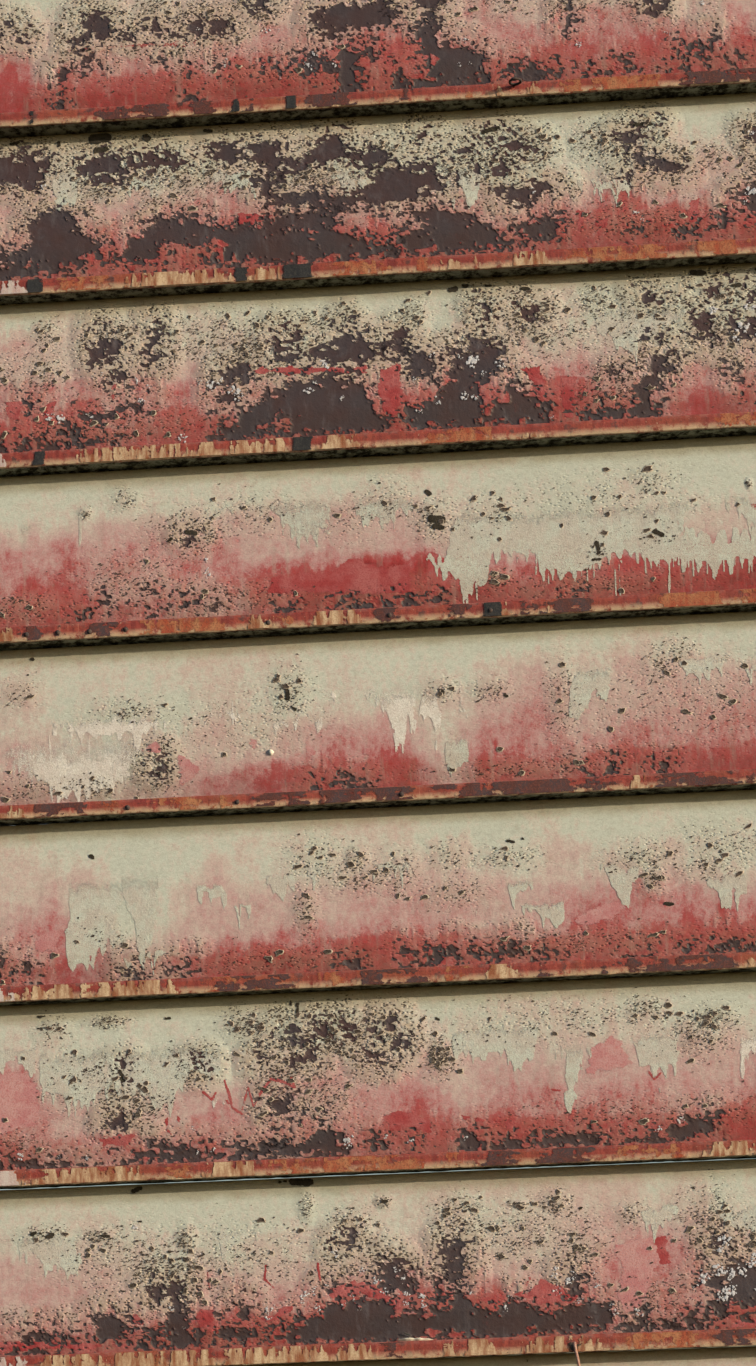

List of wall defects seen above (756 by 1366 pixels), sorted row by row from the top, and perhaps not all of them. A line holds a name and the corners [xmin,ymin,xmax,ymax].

peeling [44,0,756,121]
peeling [0,112,756,281]
rust [124,266,281,287]
peeling [0,307,175,453]
peeling [197,272,756,441]
rust [76,438,293,462]
peeling [323,928,571,985]
rust [14,979,182,1001]
rust [22,1155,425,1185]
peeling [0,1195,756,1358]
rust [40,1344,379,1366]
rust [443,1339,502,1356]